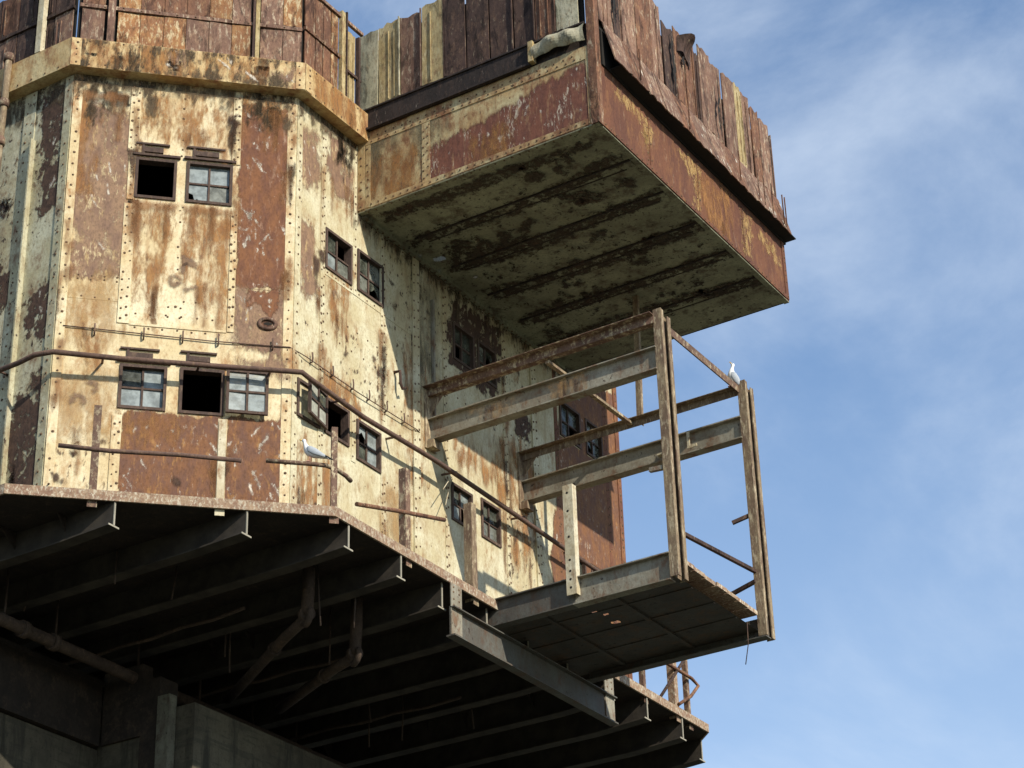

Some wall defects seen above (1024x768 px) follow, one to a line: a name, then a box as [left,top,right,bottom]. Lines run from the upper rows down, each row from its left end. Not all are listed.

peeling [35,85,66,220]
rust [370,61,589,201]
peeling [19,264,60,347]
rust [51,42,440,487]
peeling [446,299,502,374]
peeling [470,377,501,397]
rust [411,178,734,342]